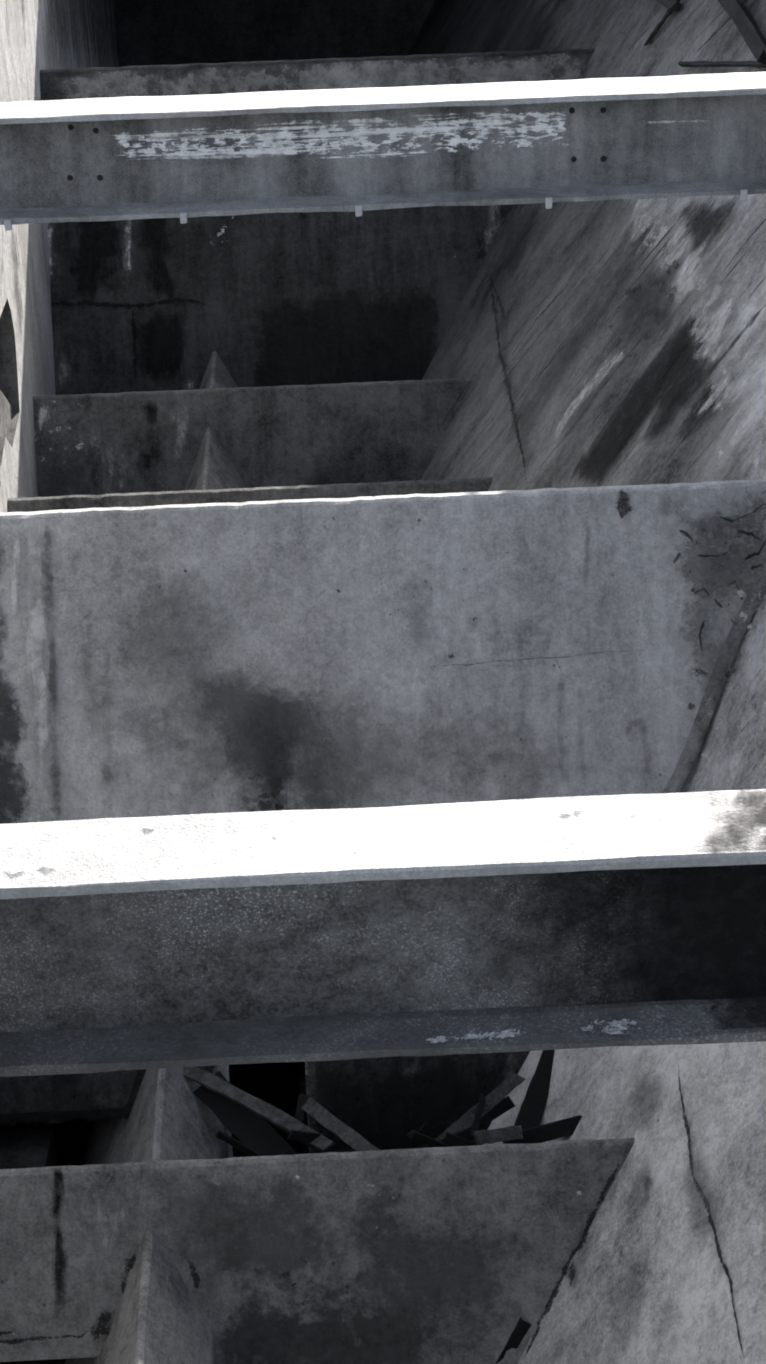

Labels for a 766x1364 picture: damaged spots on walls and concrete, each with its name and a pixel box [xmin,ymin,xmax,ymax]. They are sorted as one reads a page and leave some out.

damp [254,288,438,386]
crack [443,275,568,467]
damp [558,199,748,482]
damp [0,531,58,824]
damp [203,672,335,811]
damp [208,1175,519,1364]
crack [526,1148,627,1355]
crack [678,1065,743,1353]